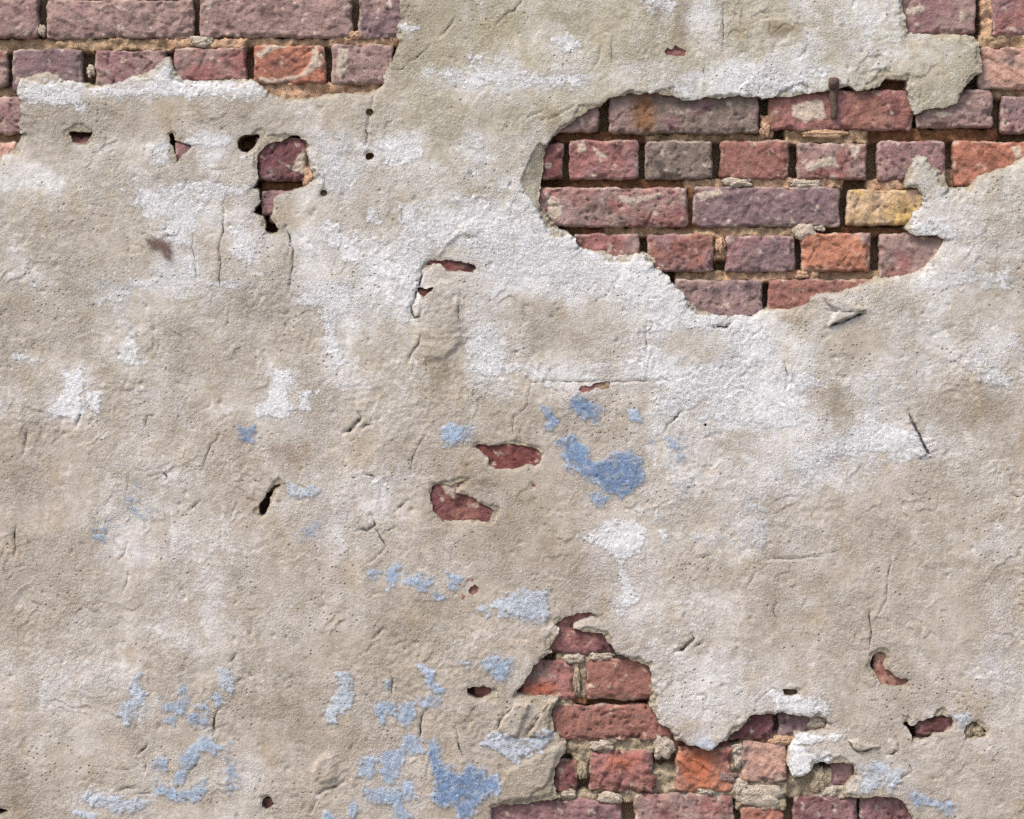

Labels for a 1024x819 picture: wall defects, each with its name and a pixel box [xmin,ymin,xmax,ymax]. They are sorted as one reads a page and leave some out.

spalling [0,0,420,156]
spalling [521,0,1024,317]
spalling [201,134,327,234]
spalling [426,259,476,272]
spalling [465,422,541,469]
crack [908,413,929,454]
spalling [258,484,280,516]
spalling [430,481,494,522]
spalling [491,612,913,819]
spalling [903,715,987,741]
peeling [927,799,960,816]